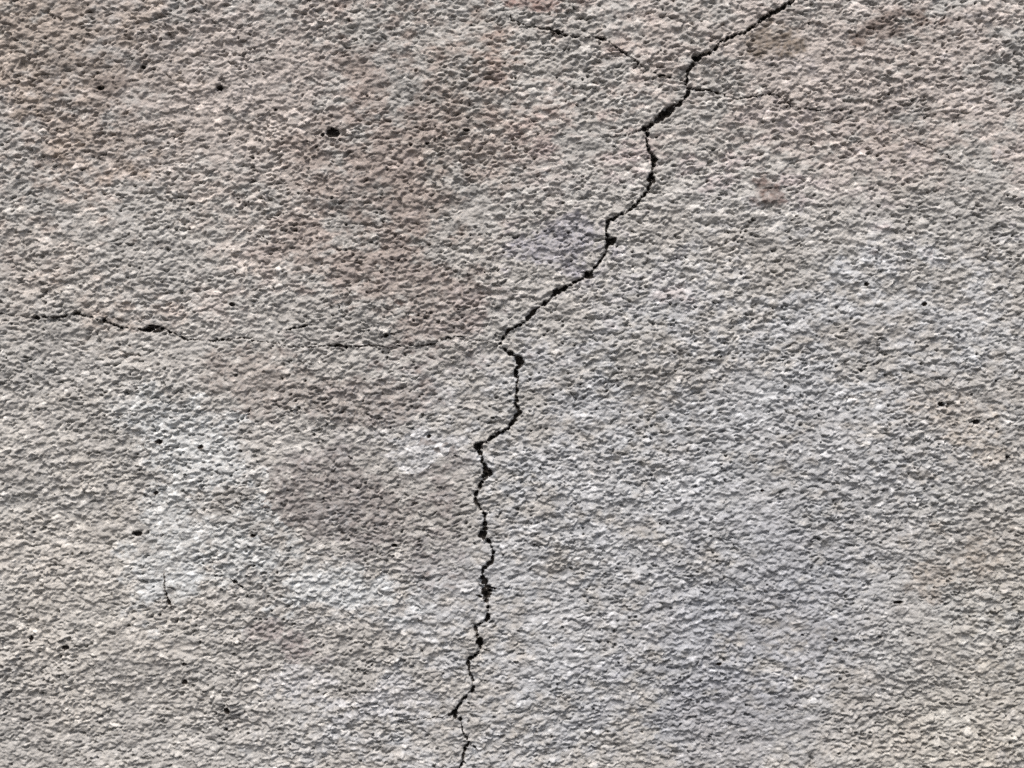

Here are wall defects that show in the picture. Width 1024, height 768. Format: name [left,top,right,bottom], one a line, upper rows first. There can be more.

crack [0,311,129,329]
crack [137,0,847,768]